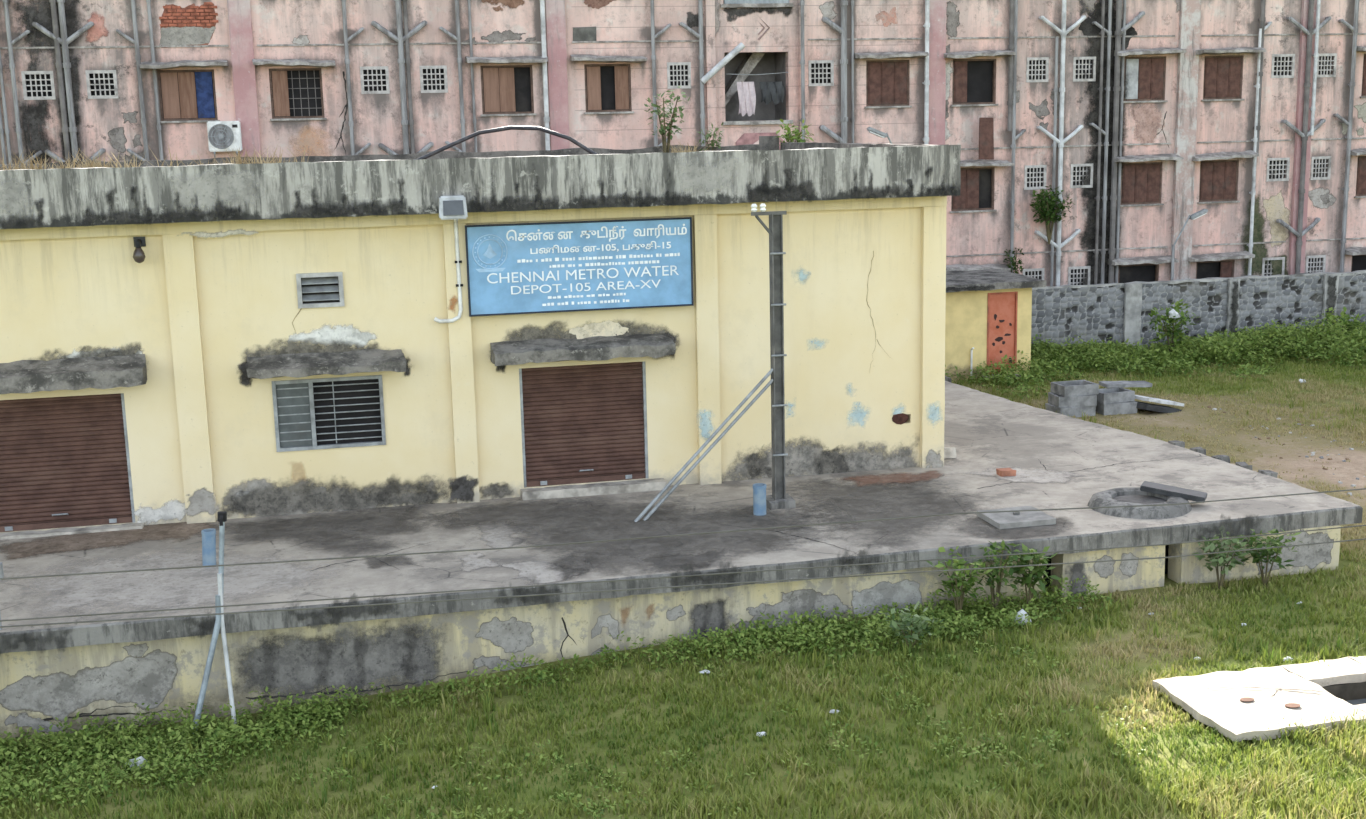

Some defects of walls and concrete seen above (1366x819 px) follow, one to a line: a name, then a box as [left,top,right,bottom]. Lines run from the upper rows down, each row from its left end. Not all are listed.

flaking render [159,2,219,48]
water stain [13,0,83,164]
water stain [1078,0,1161,285]
water stain [84,172,254,225]
water stain [294,180,406,217]
crack [866,251,891,372]
spalling [892,413,909,425]
flaking render [134,479,404,524]
water stain [223,476,512,516]
water stain [0,522,217,559]
crack [560,617,577,657]
flaking render [0,643,178,733]